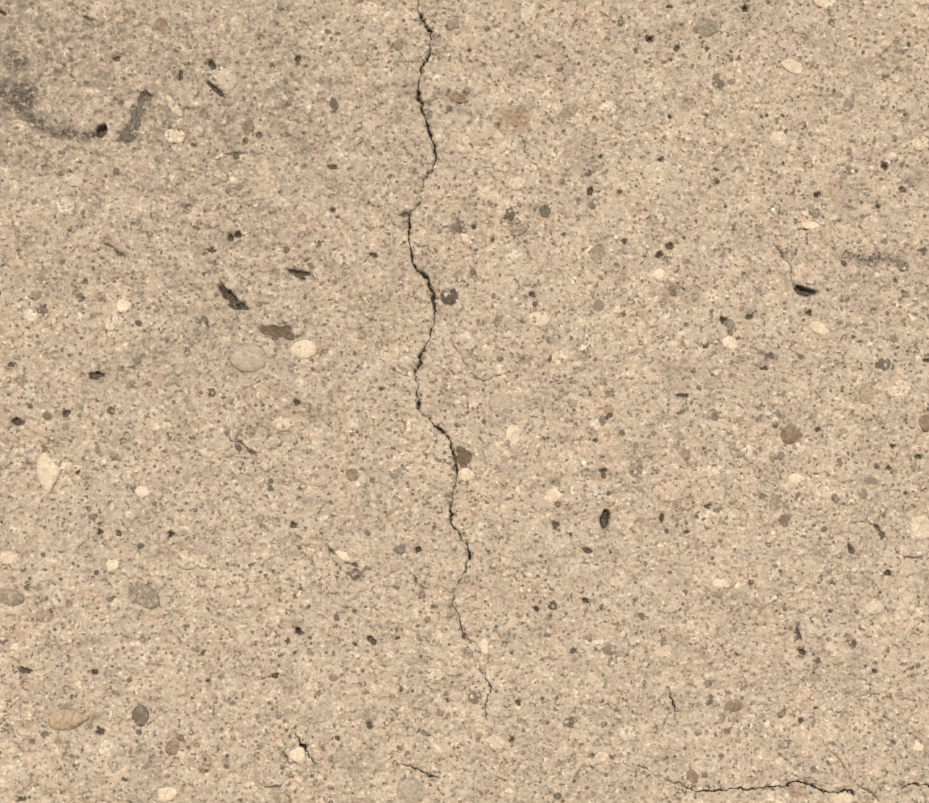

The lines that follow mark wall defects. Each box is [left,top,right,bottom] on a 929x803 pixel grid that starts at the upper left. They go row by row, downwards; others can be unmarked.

crack [389,0,515,719]
crack [637,738,877,799]